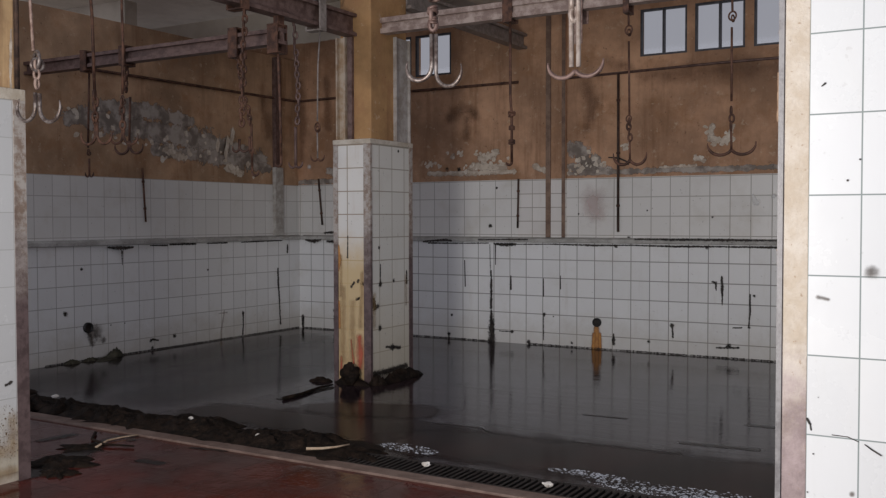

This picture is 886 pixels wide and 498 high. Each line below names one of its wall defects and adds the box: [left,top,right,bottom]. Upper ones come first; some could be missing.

peeling [61,97,272,179]
peeling [703,123,735,147]
peeling [424,149,517,177]
peeling [567,140,778,176]